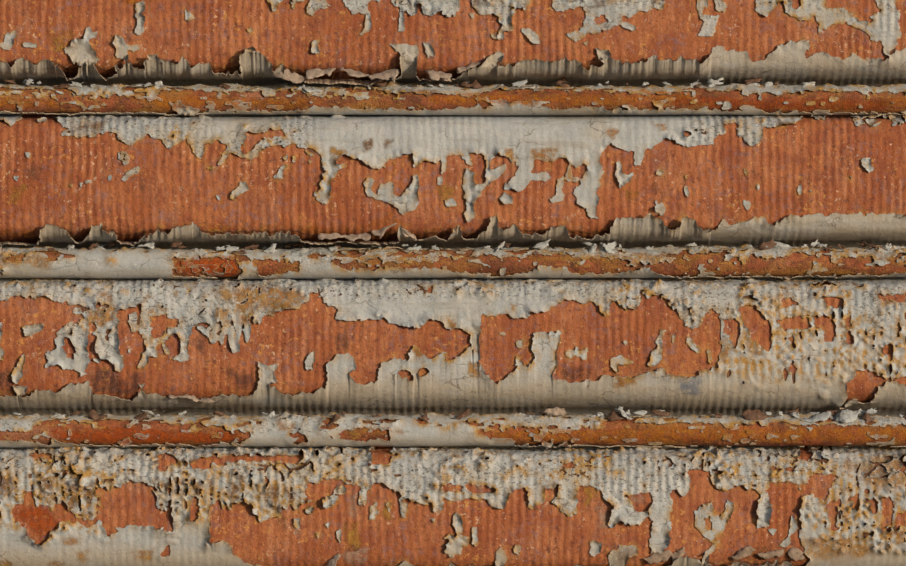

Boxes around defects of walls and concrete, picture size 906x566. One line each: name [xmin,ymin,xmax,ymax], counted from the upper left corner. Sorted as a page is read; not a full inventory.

peeling [0,0,906,222]
corrosion [422,90,906,109]
corrosion [176,257,238,276]
corrosion [217,288,305,323]
peeling [0,200,906,566]
corrosion [863,458,906,484]
corrosion [265,486,295,512]